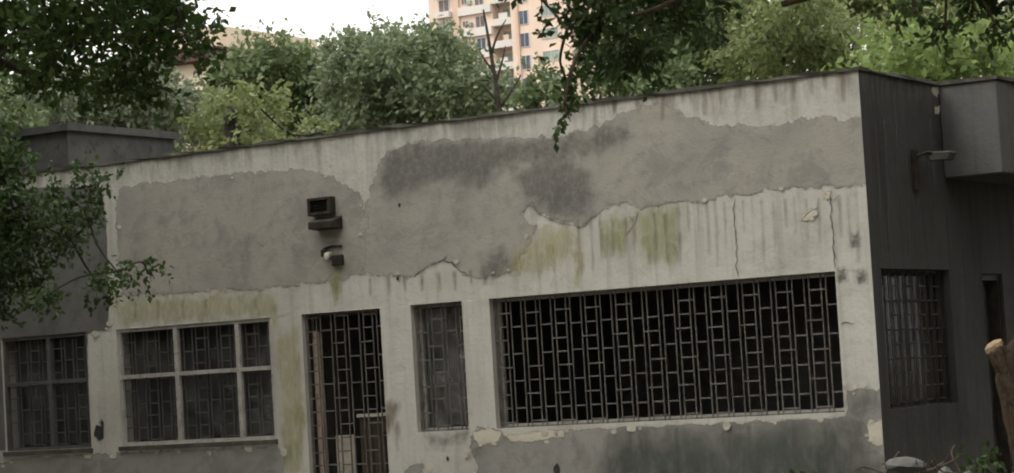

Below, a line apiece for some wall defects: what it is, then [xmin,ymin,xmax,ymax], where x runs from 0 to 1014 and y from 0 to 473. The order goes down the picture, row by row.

peeling [0,103,885,473]
crack [731,199,739,275]